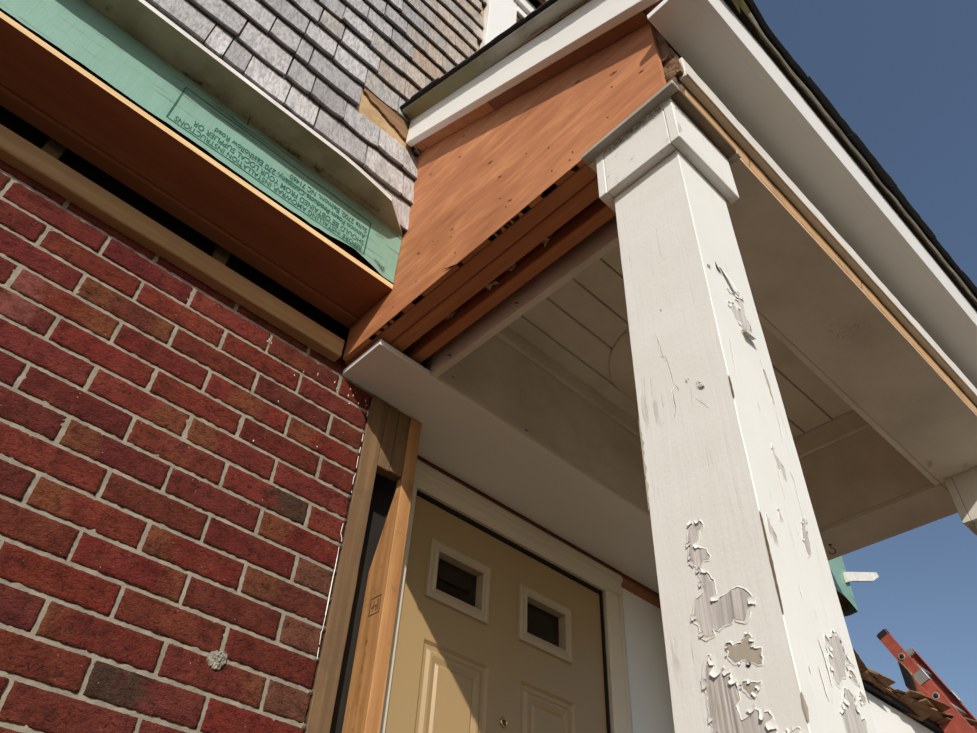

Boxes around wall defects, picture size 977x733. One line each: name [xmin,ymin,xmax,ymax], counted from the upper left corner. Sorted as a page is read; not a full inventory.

peeling [707,261,759,341]
peeling [685,508,809,733]
peeling [823,629,868,733]